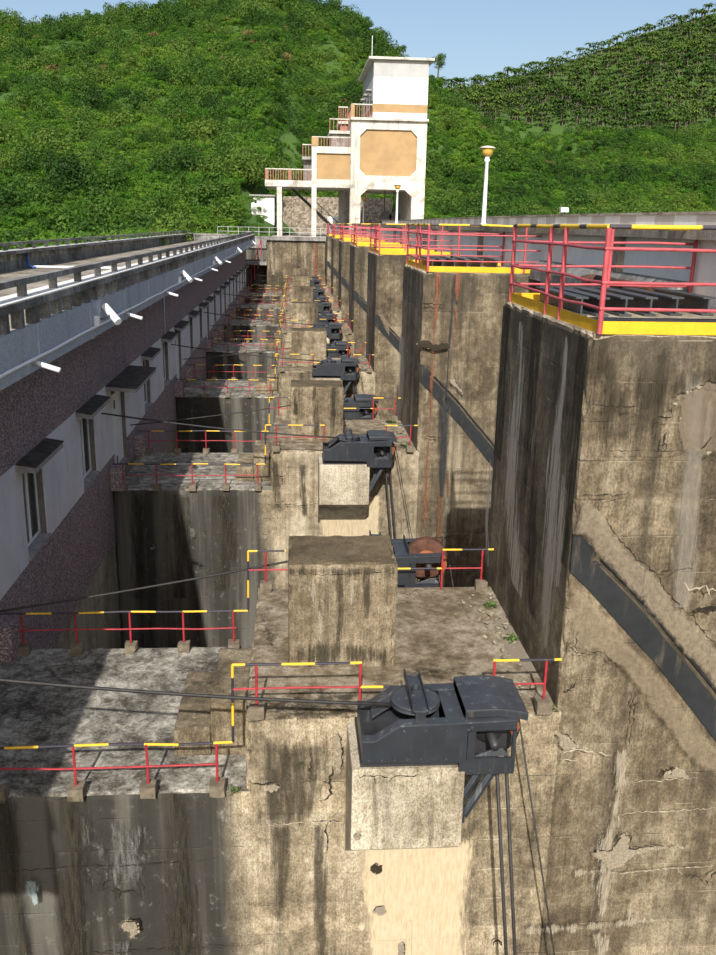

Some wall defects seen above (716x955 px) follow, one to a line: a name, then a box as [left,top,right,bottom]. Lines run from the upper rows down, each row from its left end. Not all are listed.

water stain [485,303,716,649]
crack [583,494,716,647]
crack [568,632,616,664]
crack [561,693,640,761]
spalling [663,766,689,778]
water stain [0,800,38,955]
water stain [113,829,140,884]
spalling [370,862,382,874]
spalling [589,832,688,869]
spalling [372,905,387,916]
spalling [120,920,140,939]